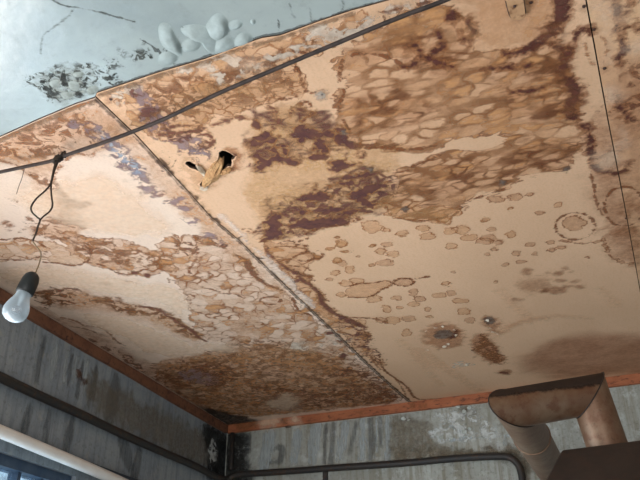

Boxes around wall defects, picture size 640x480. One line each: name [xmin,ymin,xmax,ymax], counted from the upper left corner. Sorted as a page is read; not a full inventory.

damp [573,25,594,42]
damp [612,0,640,67]
flaking render [26,64,122,103]
damp [113,33,315,127]
damp [330,50,369,82]
damp [614,94,640,123]
damp [588,162,630,176]
damp [546,212,634,265]
damp [325,236,354,281]
damp [336,276,430,307]
damp [83,361,252,480]